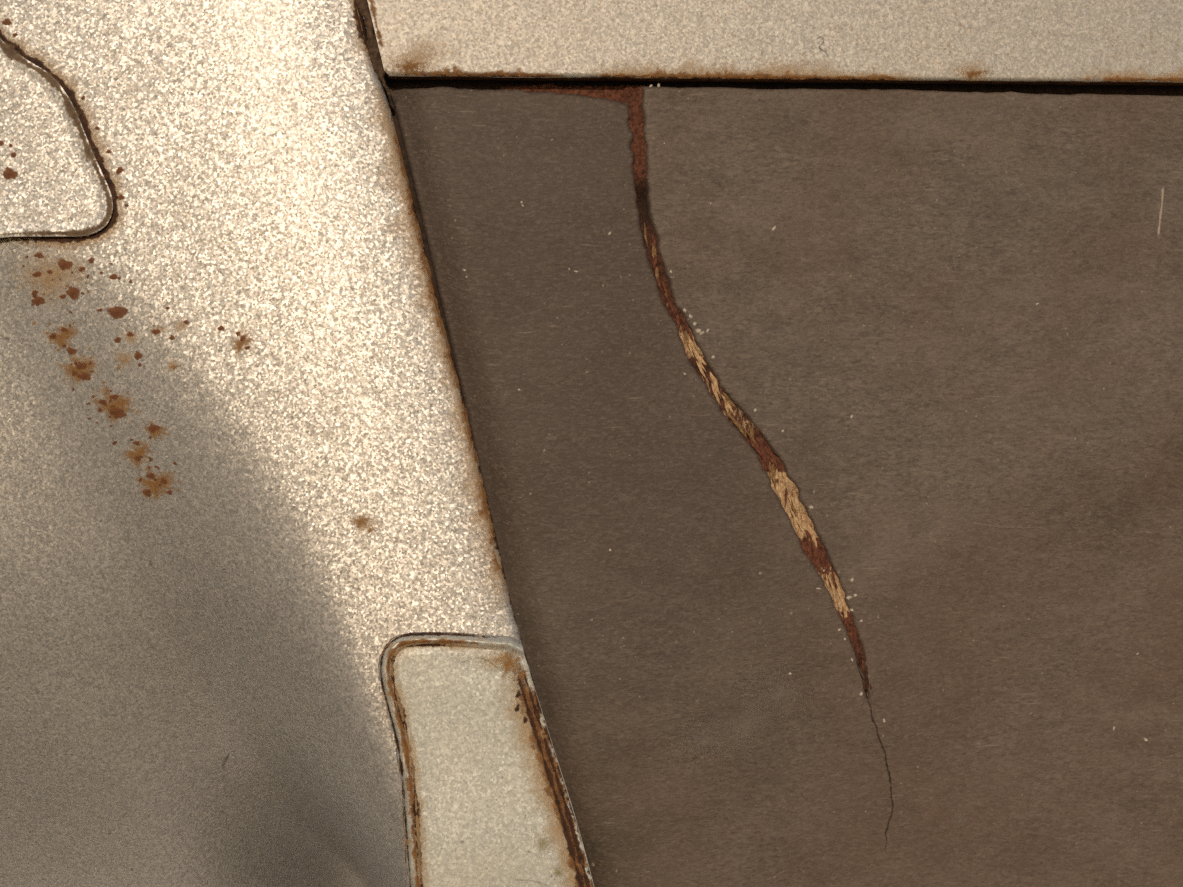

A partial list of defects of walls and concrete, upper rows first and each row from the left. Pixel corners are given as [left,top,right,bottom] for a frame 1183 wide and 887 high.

rust [397,55,564,77]
rust [597,67,906,80]
rust [1053,74,1183,83]
rust [0,18,132,427]
rust [114,332,142,370]
rust [218,326,251,353]
rust [112,423,177,499]
crack [500,83,893,848]
rust [380,101,594,887]
rust [354,516,373,533]